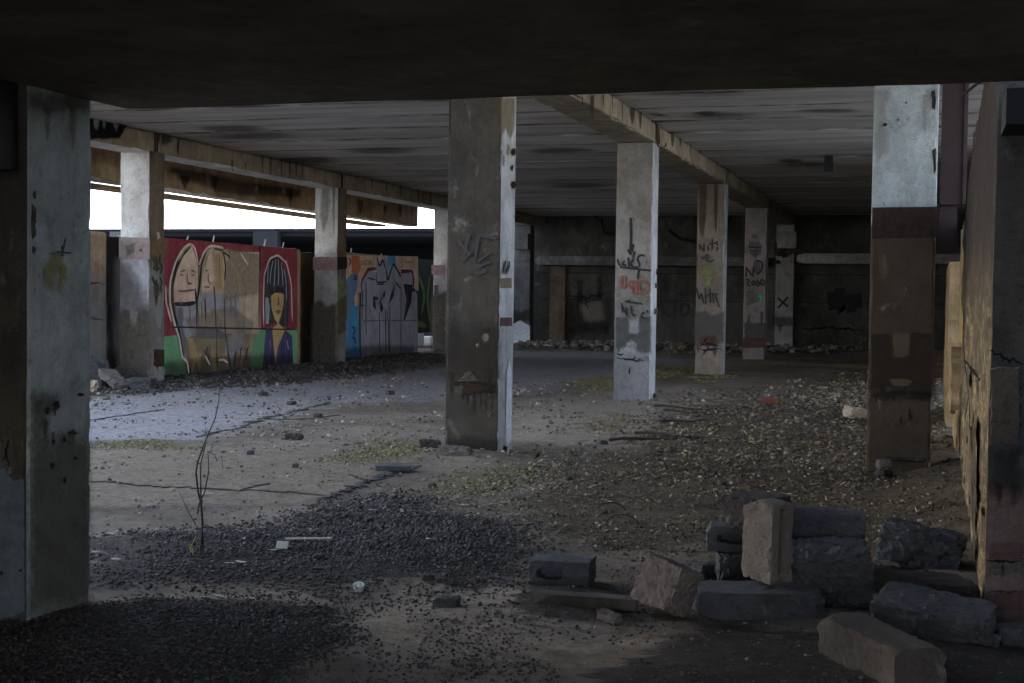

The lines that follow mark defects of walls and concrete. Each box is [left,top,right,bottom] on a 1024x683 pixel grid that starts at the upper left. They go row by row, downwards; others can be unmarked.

leakage [173,155,303,205]
crack [990,350,1024,439]